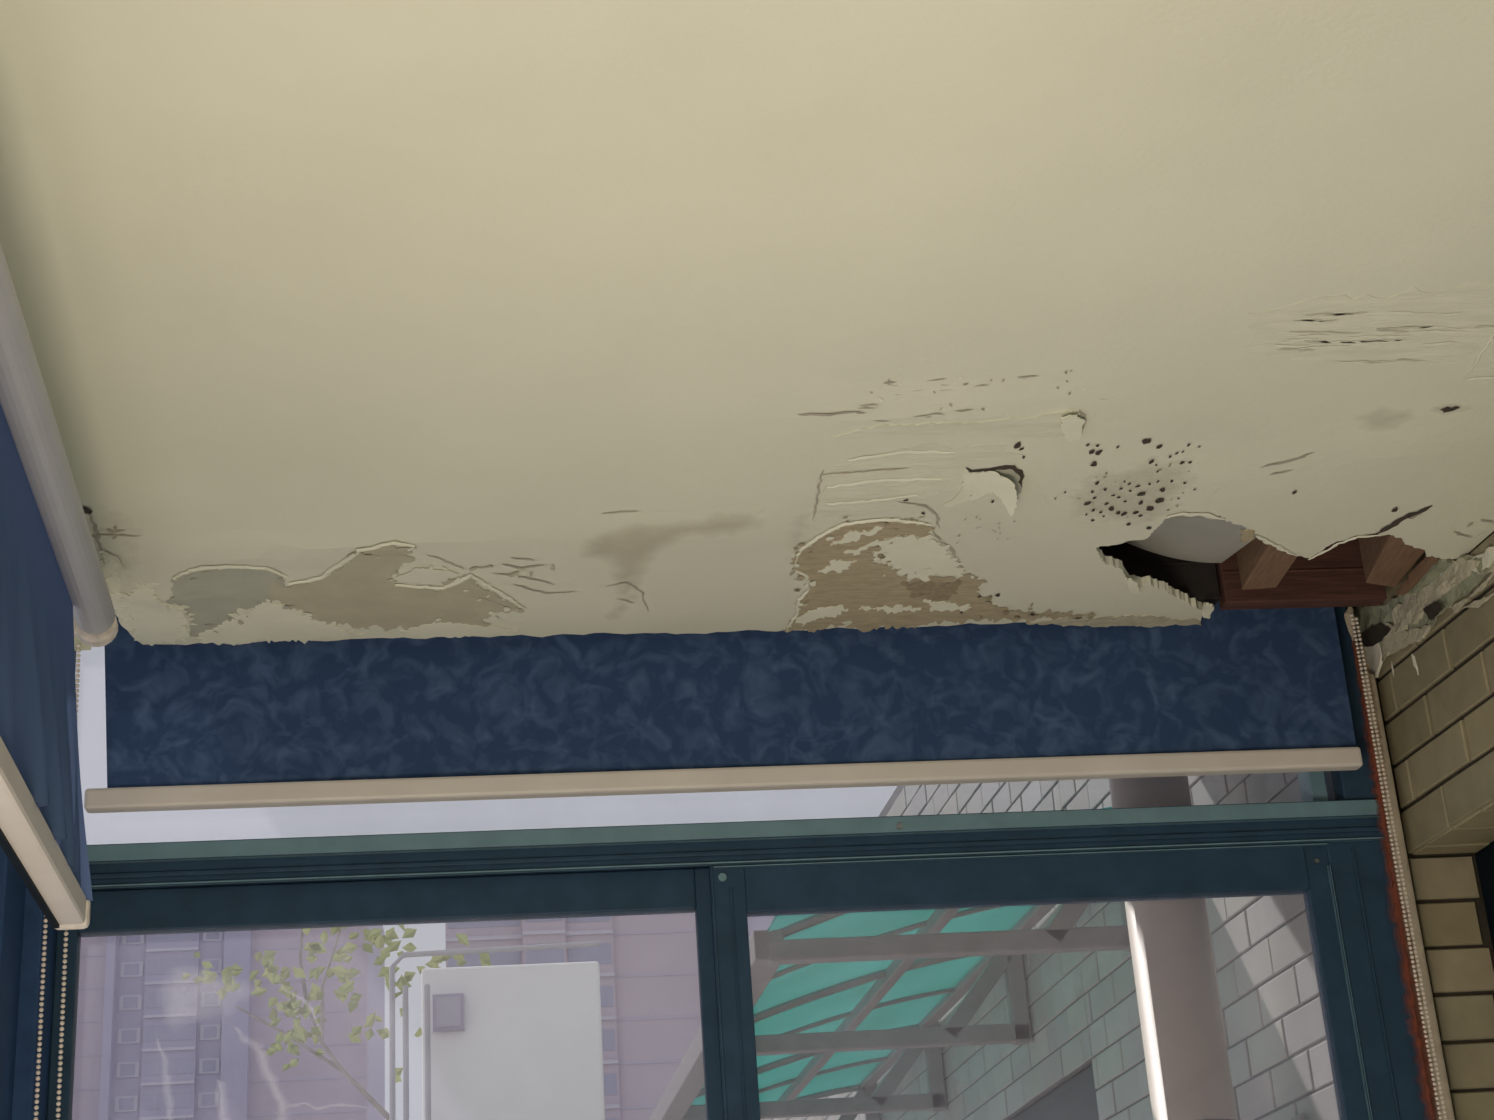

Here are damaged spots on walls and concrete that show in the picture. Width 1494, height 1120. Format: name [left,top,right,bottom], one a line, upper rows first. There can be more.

peeling [83,507,570,646]
peeling [783,442,1214,633]
damp [1054,439,1201,530]
spalling [1240,529,1381,560]
flaking render [1344,520,1494,678]